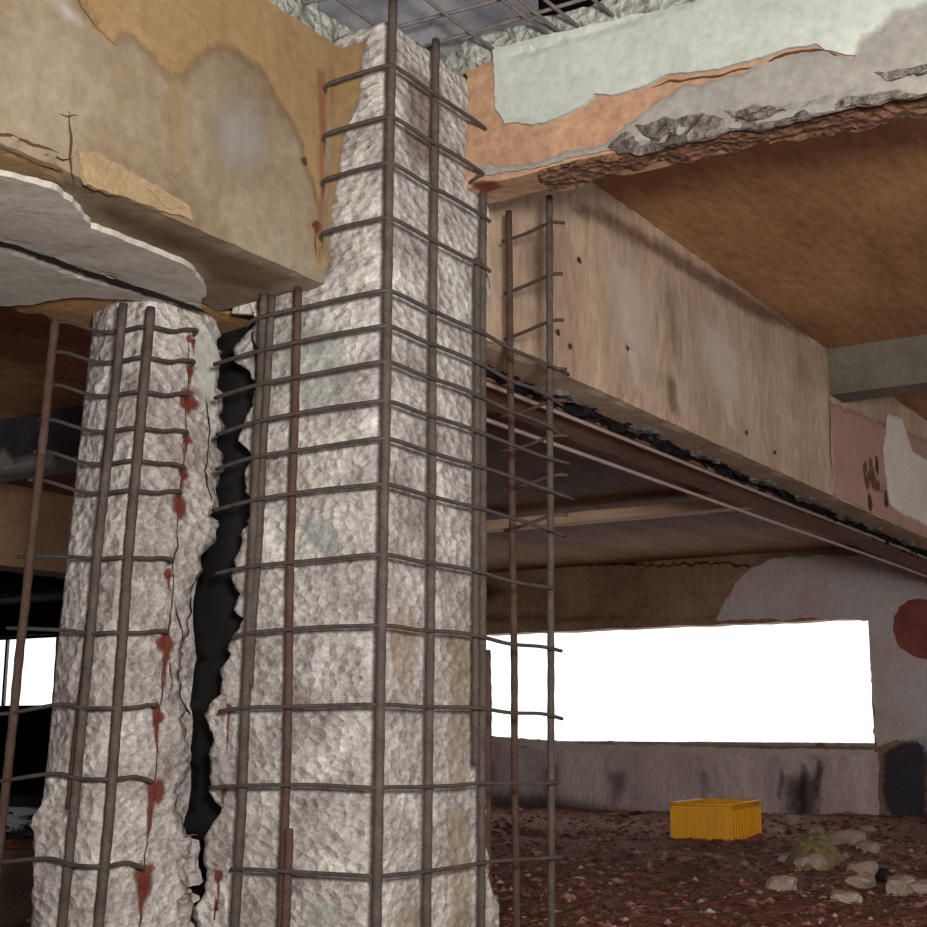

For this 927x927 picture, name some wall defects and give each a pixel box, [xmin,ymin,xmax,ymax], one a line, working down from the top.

flaking render [79,0,365,272]
crack [0,242,208,313]
rust [173,466,188,519]
flaking render [371,0,927,927]
flaking render [0,146,207,927]
crack [154,308,257,907]
spalling [277,287,302,927]
rust [156,634,173,685]
rust [153,707,164,747]
rust [146,780,165,832]
damp [791,768,821,814]
rust [135,864,153,913]